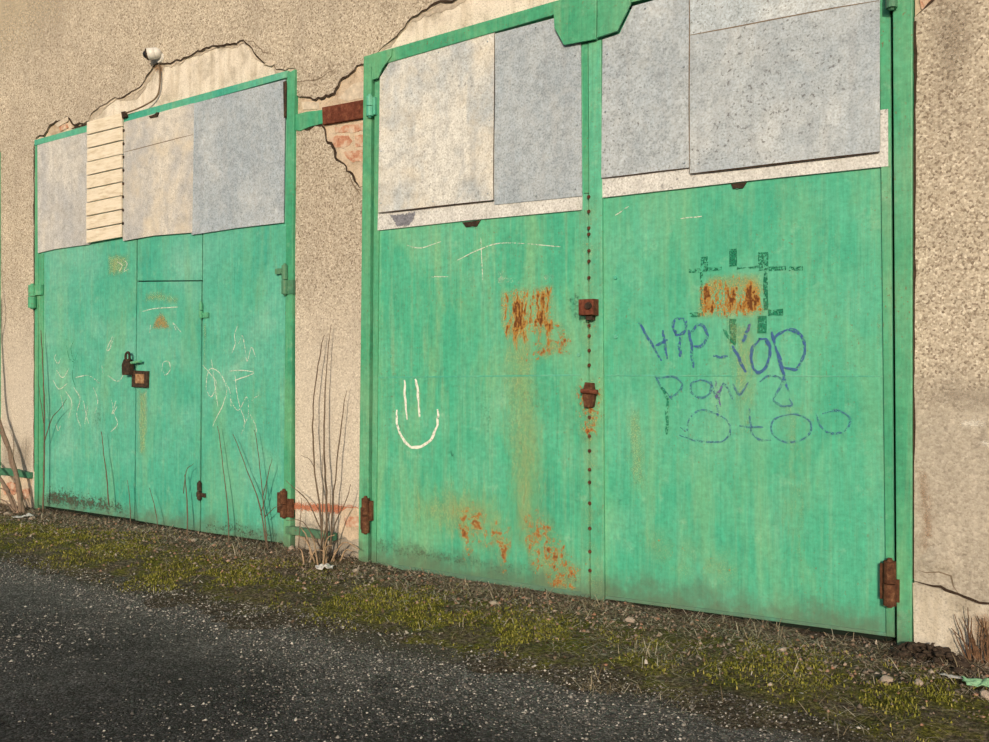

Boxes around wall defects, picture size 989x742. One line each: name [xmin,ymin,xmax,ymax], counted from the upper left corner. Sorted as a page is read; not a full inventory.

flaking render [379,0,557,52]
flaking render [915,0,934,16]
flaking render [35,39,296,139]
flaking render [298,64,364,114]
flaking render [304,119,363,188]
corrosion [501,287,572,365]
corrosion [700,276,763,317]
crack [912,21,989,604]
corrosion [576,382,602,435]
corrosion [453,502,590,588]